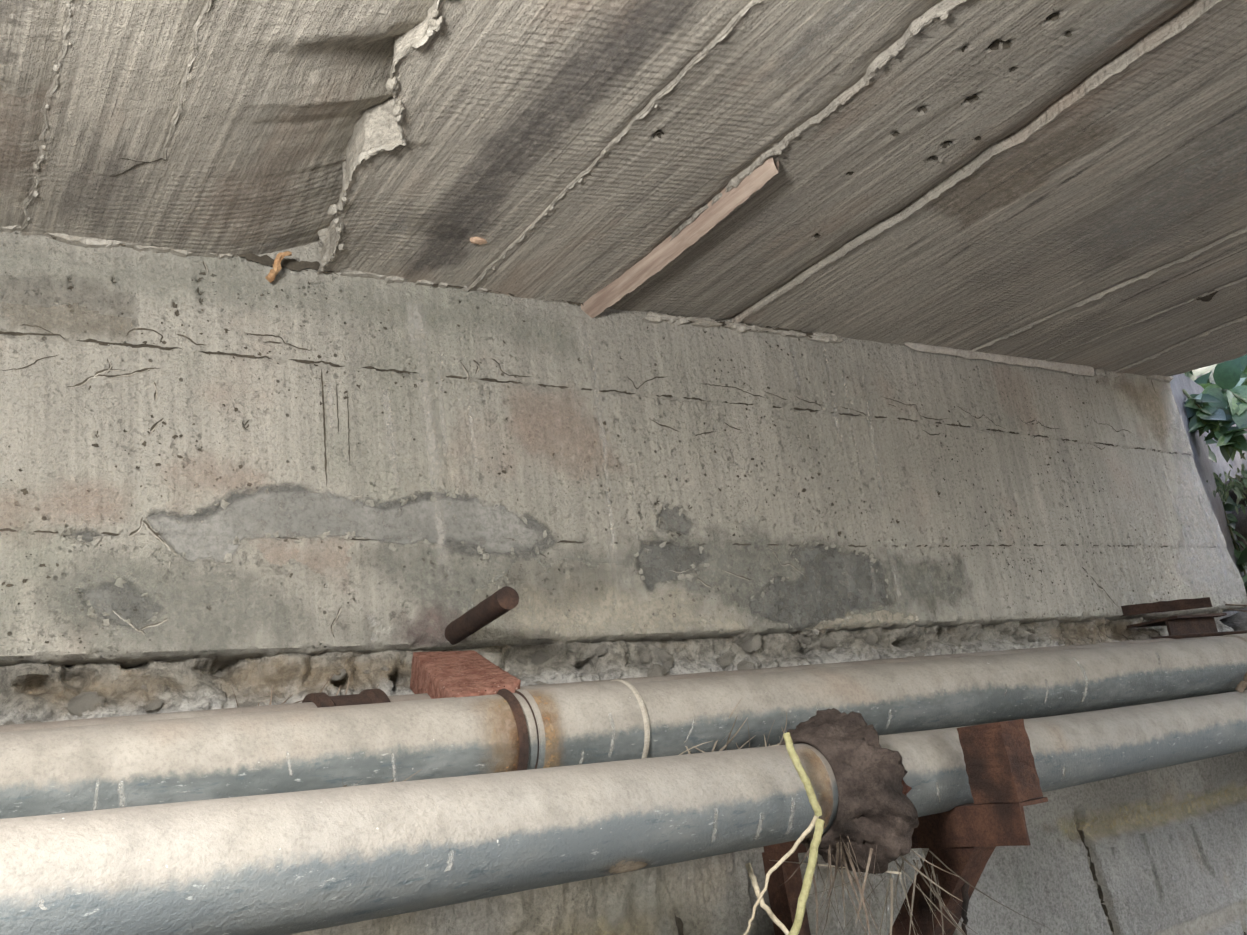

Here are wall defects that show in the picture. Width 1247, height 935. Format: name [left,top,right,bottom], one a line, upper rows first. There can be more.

peeling [385,71,404,123]
water stain [416,0,690,269]
crack [0,324,65,371]
crack [67,328,205,433]
crack [460,358,530,383]
crack [247,333,350,486]
crack [652,420,742,436]
crack [701,383,1058,435]
peeling [147,483,555,567]
peeling [73,575,161,628]